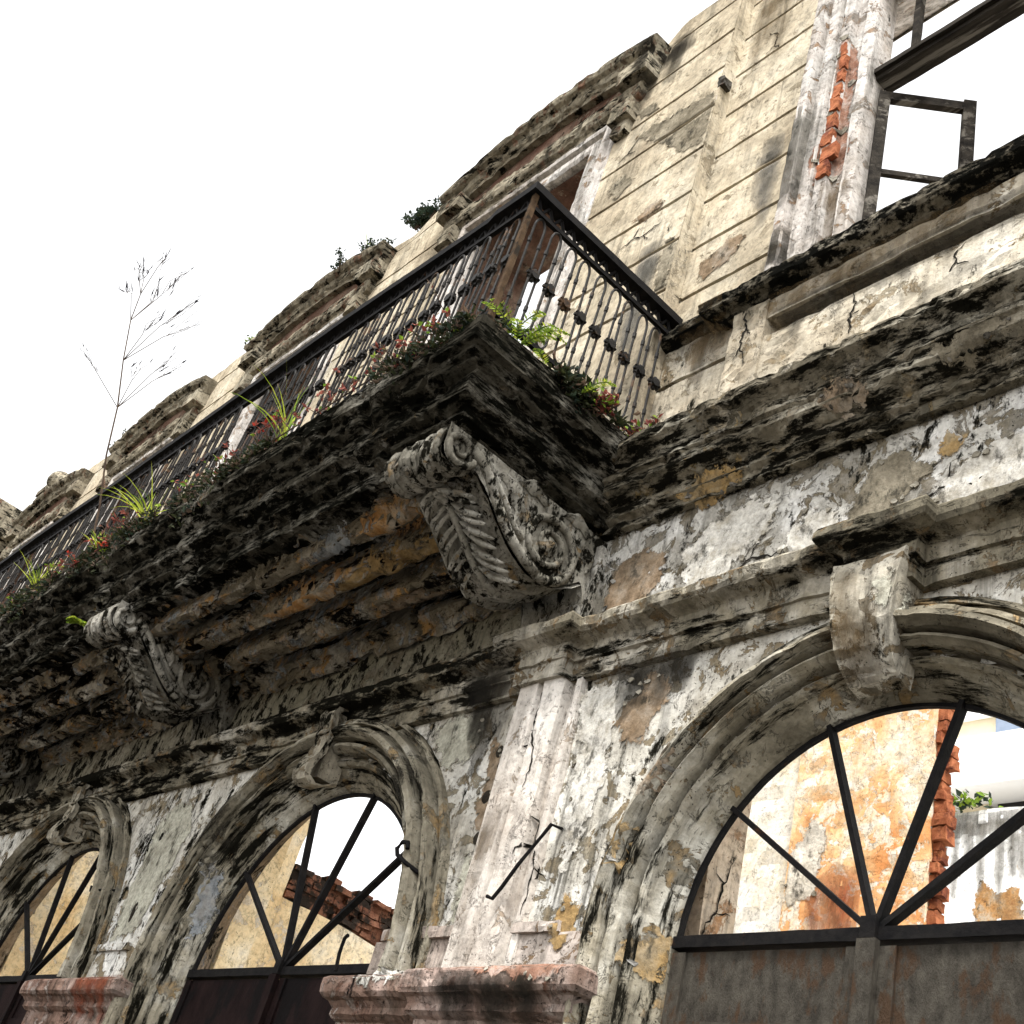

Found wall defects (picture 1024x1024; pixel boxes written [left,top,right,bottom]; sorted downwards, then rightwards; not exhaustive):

flaking render [807,34,859,186]
crack [949,243,969,272]
crack [732,314,750,363]
crack [847,293,859,333]
peeling [776,429,1024,554]
peeling [602,464,780,612]
damp [471,671,503,749]
crack [522,692,543,787]
spalling [473,893,582,982]
crack [512,815,546,915]
peeling [614,923,672,985]
crack [701,860,735,934]